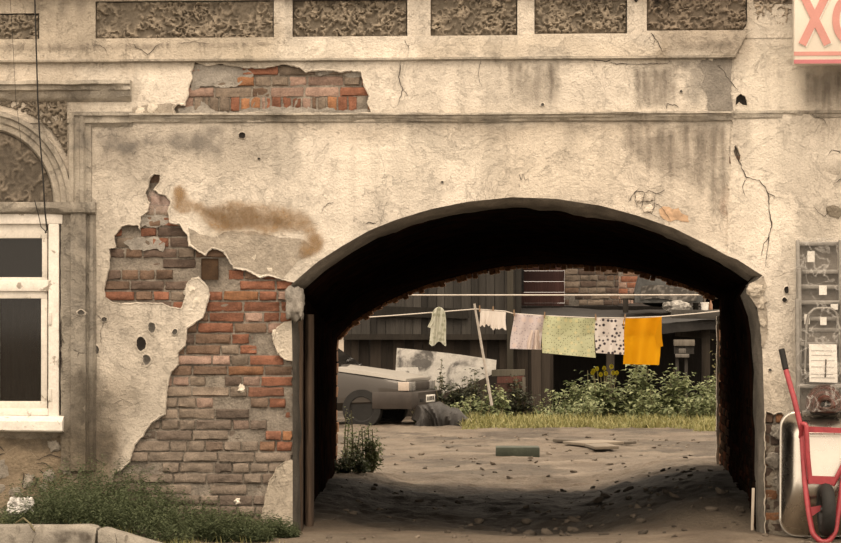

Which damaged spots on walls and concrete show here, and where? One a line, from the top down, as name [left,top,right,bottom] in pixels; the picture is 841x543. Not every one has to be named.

spalling [132,62,372,113]
crack [628,188,669,218]
crack [734,146,775,266]
spalling [103,173,313,529]